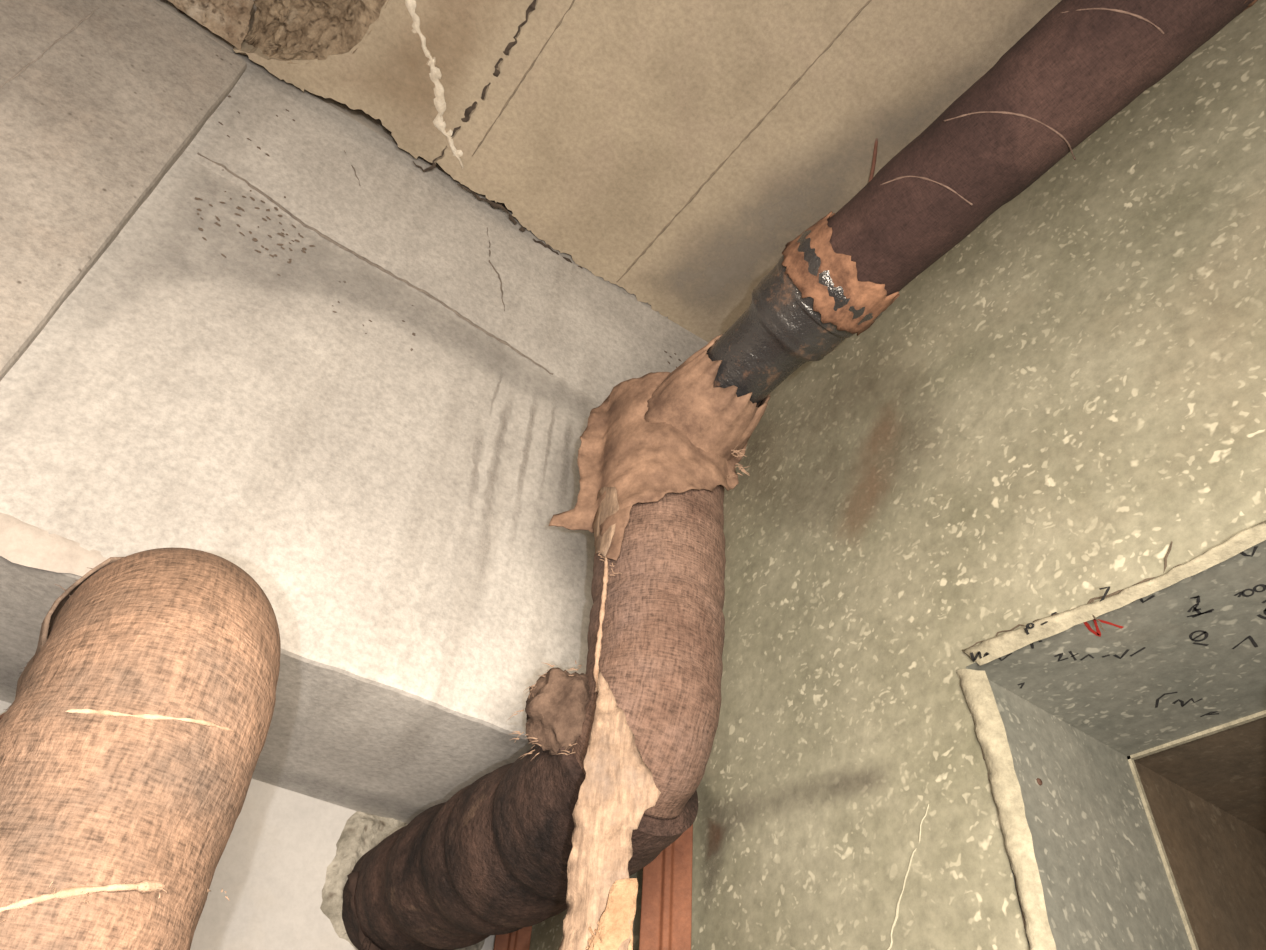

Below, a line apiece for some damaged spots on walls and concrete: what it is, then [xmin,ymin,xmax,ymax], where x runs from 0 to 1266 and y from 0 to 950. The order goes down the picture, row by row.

spalling [167,0,389,64]
crack [405,0,583,311]